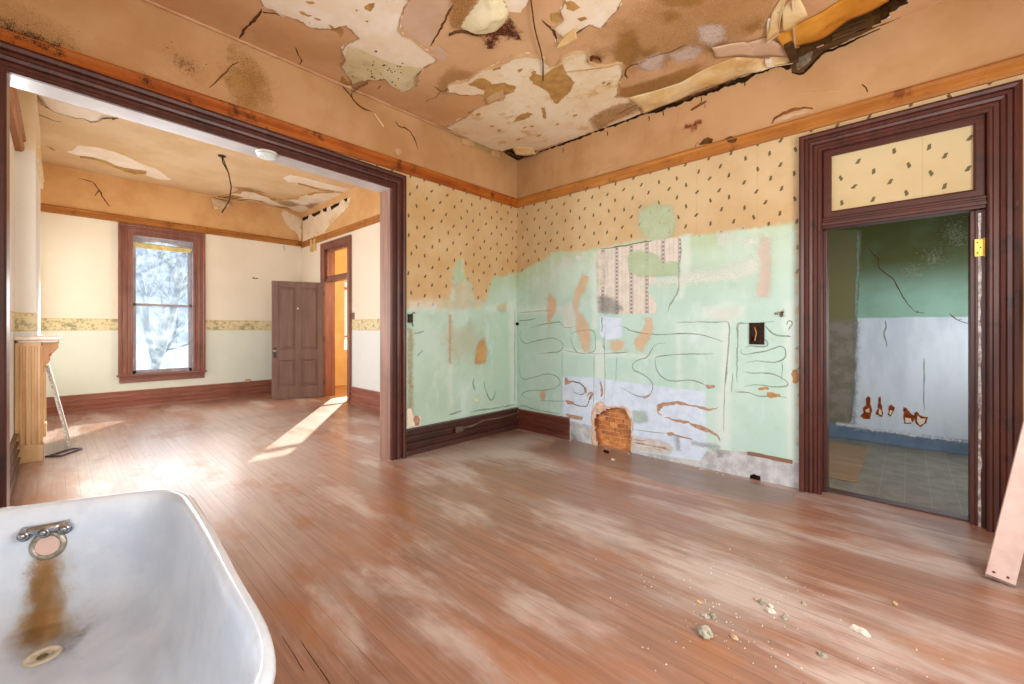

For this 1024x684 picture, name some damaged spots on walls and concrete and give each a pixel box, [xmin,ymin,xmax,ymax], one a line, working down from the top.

crack [209,9,280,88]
water stain [217,42,281,117]
peeling [260,0,438,92]
crack [342,86,418,148]
peeling [446,0,641,160]
spalling [712,18,899,75]
peeling [68,145,170,180]
peeling [217,175,351,252]
crack [855,232,921,328]
spalling [565,377,634,451]
spalling [643,394,720,441]
rust [0,549,86,659]